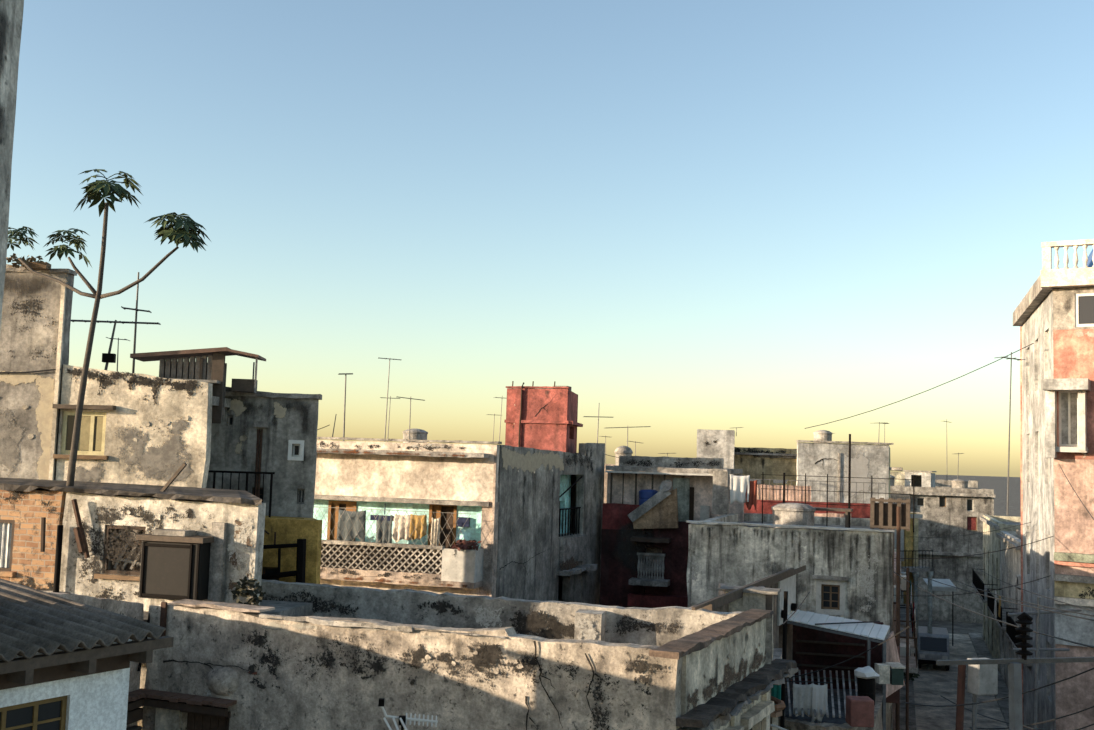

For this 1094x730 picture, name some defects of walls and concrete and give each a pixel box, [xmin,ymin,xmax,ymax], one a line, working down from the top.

peeling [0,371,55,480]
leakage [239,623,591,699]
leakage [418,600,464,619]
leakage [509,607,575,639]
crack [525,641,563,730]
crack [585,653,605,720]
leakage [617,654,668,730]
leakage [613,611,681,637]